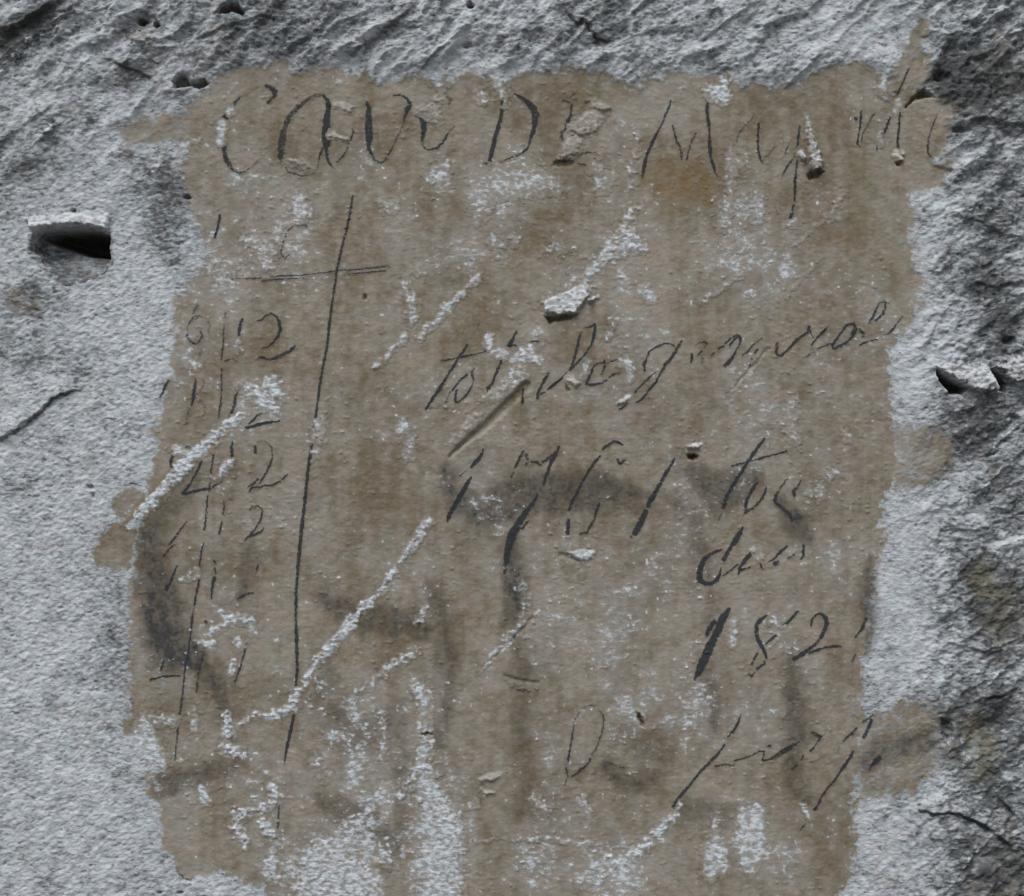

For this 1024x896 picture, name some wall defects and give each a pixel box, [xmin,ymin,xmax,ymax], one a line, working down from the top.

spalling [215,1,245,16]
spalling [0,10,67,84]
peeling [281,99,325,174]
spalling [890,147,907,164]
peeling [183,354,205,372]
spalling [928,335,1024,395]
crack [0,386,84,443]
spalling [124,408,252,532]
leakage [129,462,209,556]
leakage [129,566,238,730]
leakage [305,578,445,652]
peeling [137,514,437,896]